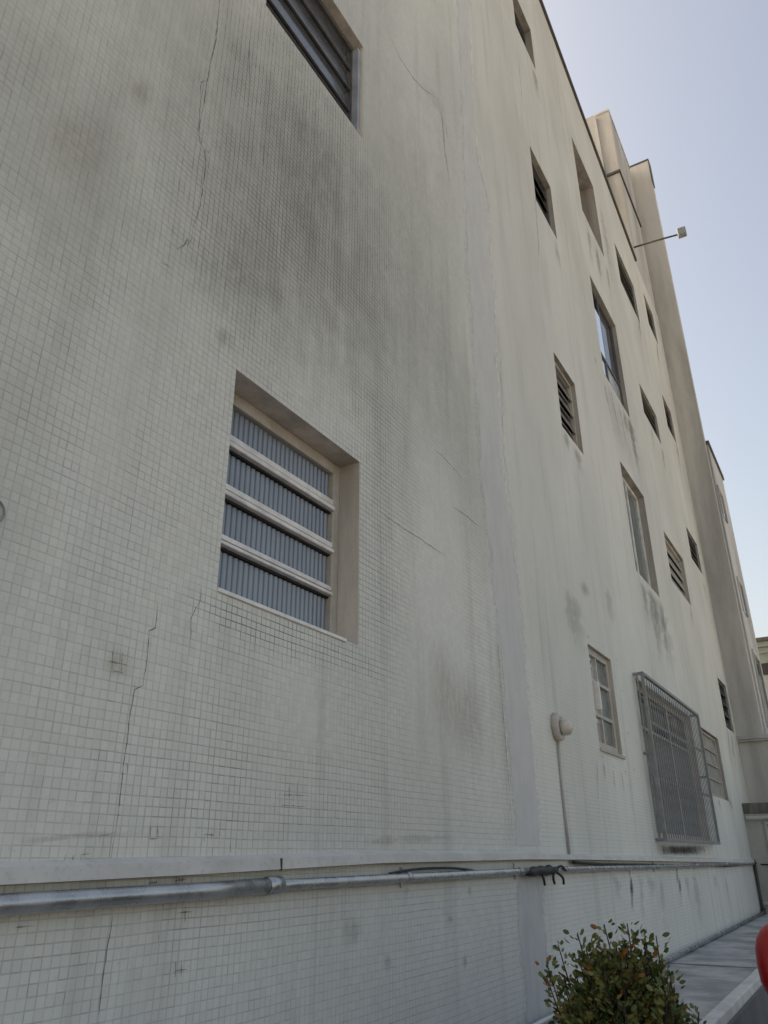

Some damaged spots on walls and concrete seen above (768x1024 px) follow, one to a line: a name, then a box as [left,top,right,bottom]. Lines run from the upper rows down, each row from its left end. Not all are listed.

crack [163,2,220,269]
crack [100,588,168,857]
crack [98,915,113,1023]